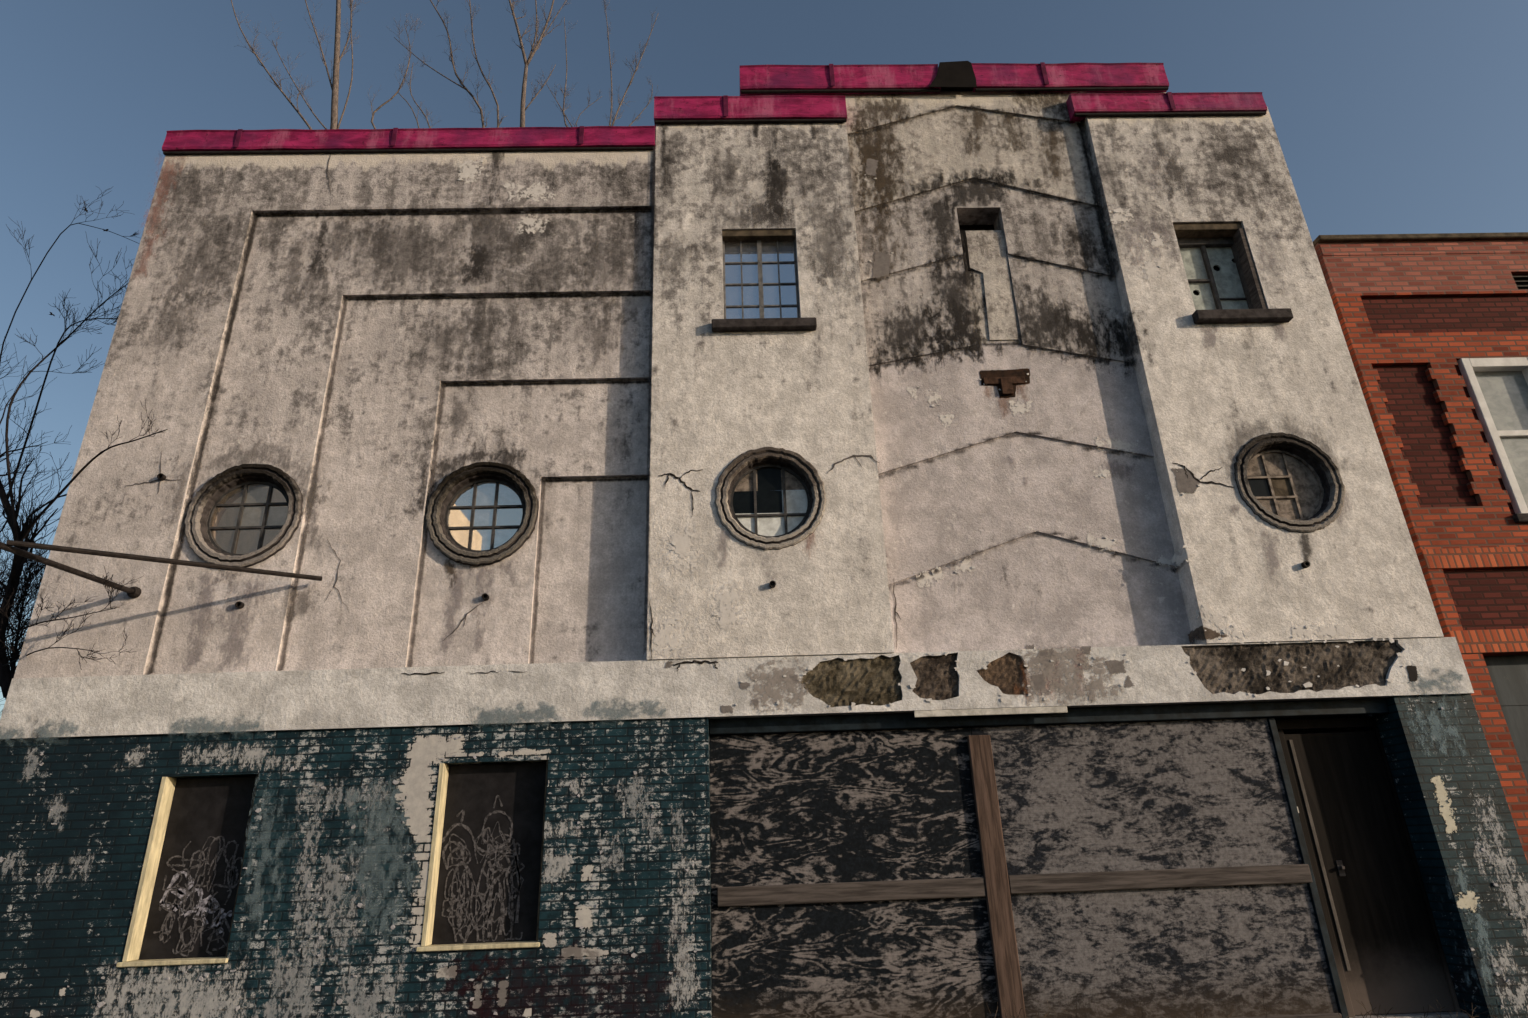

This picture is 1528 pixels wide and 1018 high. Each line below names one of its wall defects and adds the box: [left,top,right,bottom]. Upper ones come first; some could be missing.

damp [847,92,1140,374]
damp [146,124,669,675]
crack [658,469,703,517]
crack [828,455,880,472]
crack [1174,463,1234,488]
spalling [721,644,1135,713]
spalling [1182,626,1465,755]
peeling [93,731,551,1018]
peeling [1430,776,1528,1018]